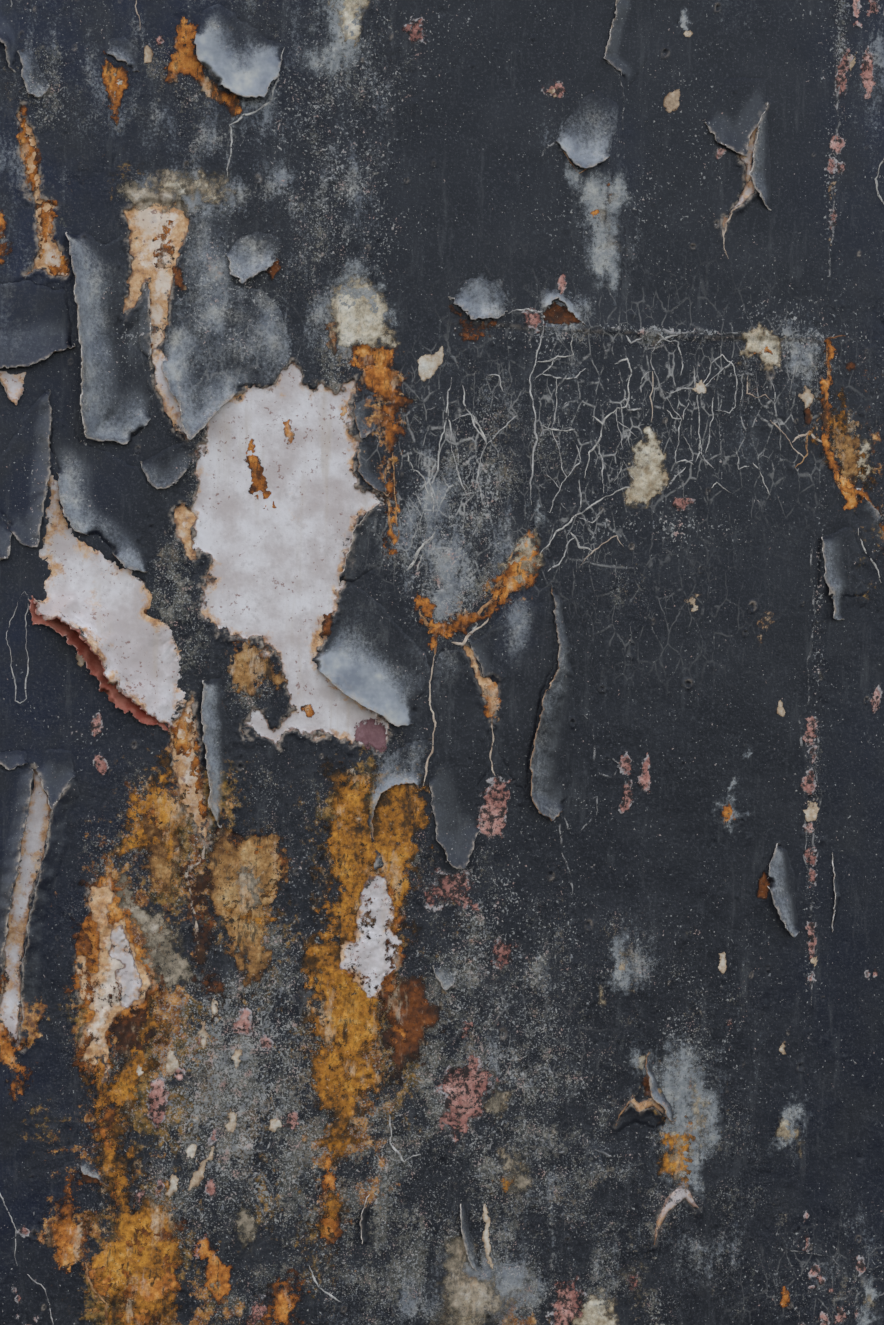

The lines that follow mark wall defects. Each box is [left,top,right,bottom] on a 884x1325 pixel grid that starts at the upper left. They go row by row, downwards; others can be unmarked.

peeling [0,0,50,98]
peeling [144,3,285,177]
crack [406,308,803,571]
rust [792,335,884,582]
peeling [0,202,586,1132]
rust [414,523,543,655]
rust [104,750,446,1325]
efflorescence [599,932,635,1004]
rust [37,996,233,1325]
peeling [134,1108,237,1203]
leakage [429,1230,521,1325]
leakage [545,1262,643,1325]